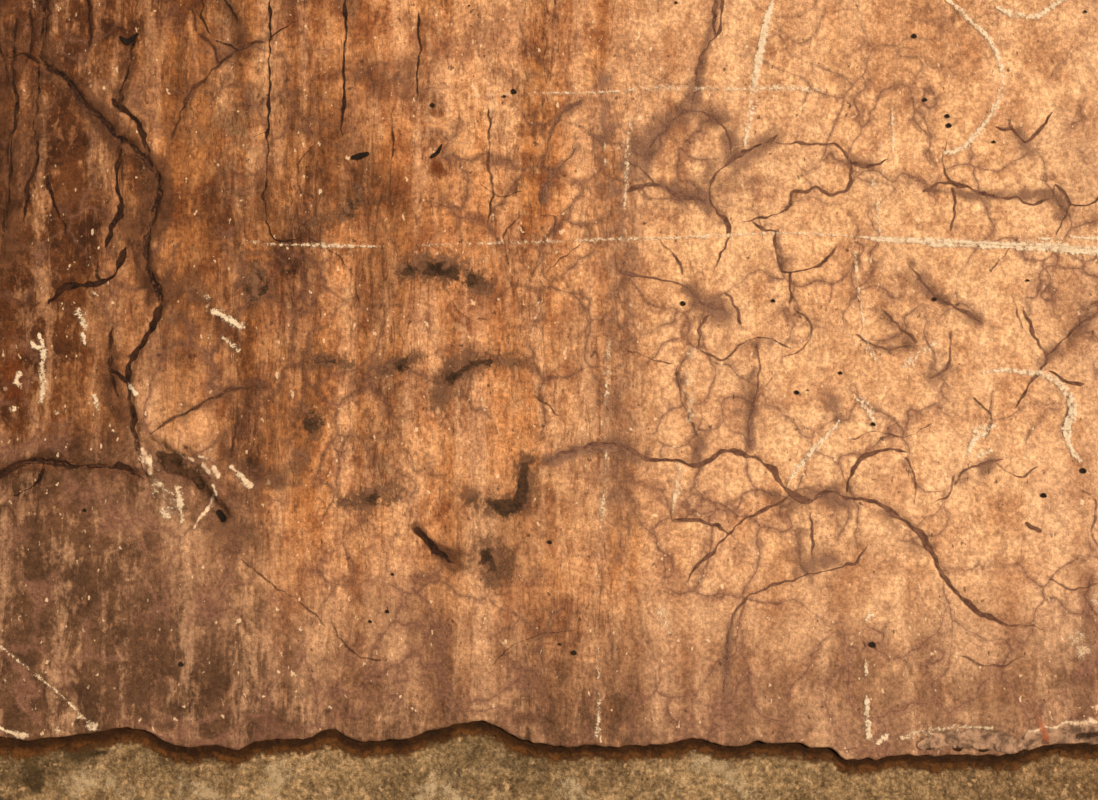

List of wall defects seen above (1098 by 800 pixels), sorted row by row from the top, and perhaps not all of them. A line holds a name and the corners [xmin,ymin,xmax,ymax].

crack [416,14,424,93]
crack [388,108,396,200]
crack [481,100,583,273]
crack [0,0,359,496]
crack [543,0,1098,693]
crack [412,522,473,572]
spalling [900,718,1098,754]